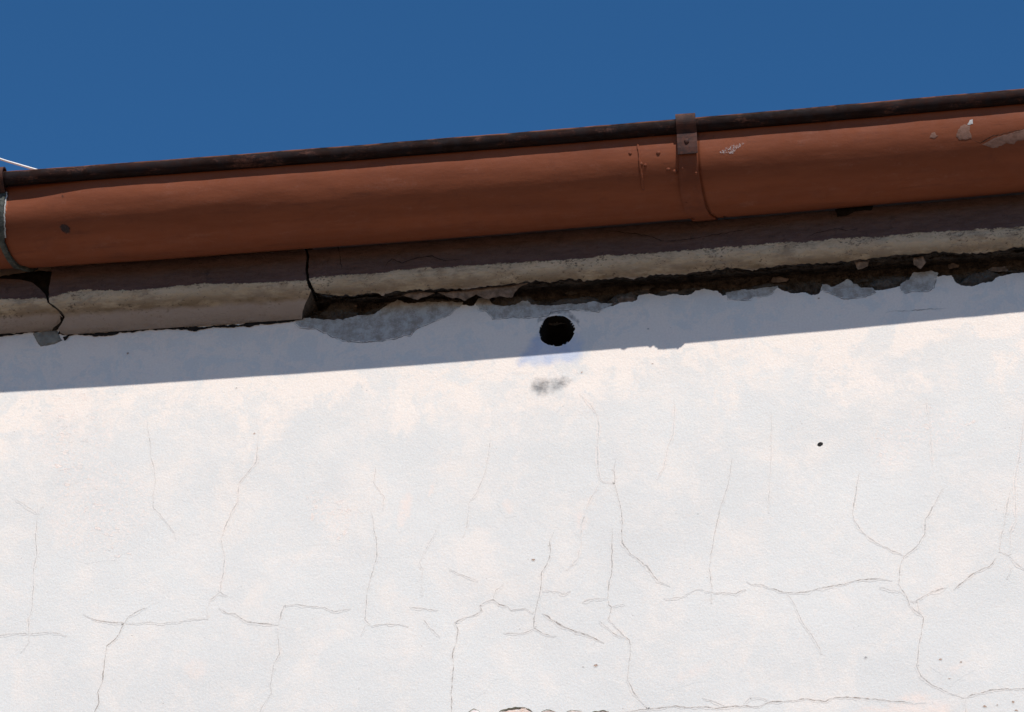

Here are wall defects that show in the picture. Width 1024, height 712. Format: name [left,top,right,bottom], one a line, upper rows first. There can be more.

crack [305,248,318,295]
flaking render [294,247,1024,343]
crack [0,499,66,653]
crack [83,394,1024,712]